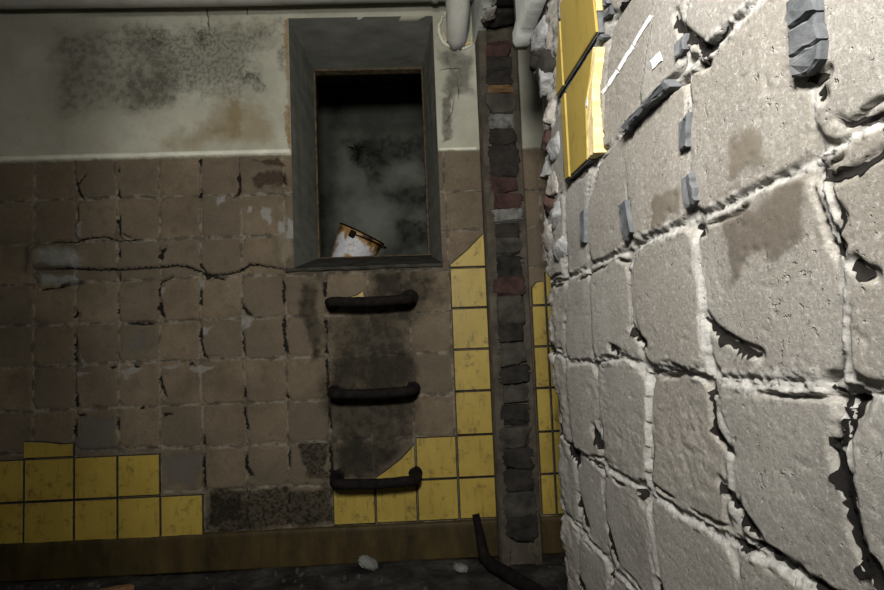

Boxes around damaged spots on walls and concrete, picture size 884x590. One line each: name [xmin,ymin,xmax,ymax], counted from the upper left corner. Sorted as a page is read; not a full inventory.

spalling [481,0,514,28]
crack [674,15,730,69]
damp [443,52,470,140]
spalling [529,14,568,263]
crack [824,149,884,181]
flaking render [484,40,538,542]
damp [726,182,800,276]
crack [837,208,877,281]
damp [327,268,433,476]
damp [206,443,334,531]
crack [828,384,884,590]
crack [719,481,836,590]